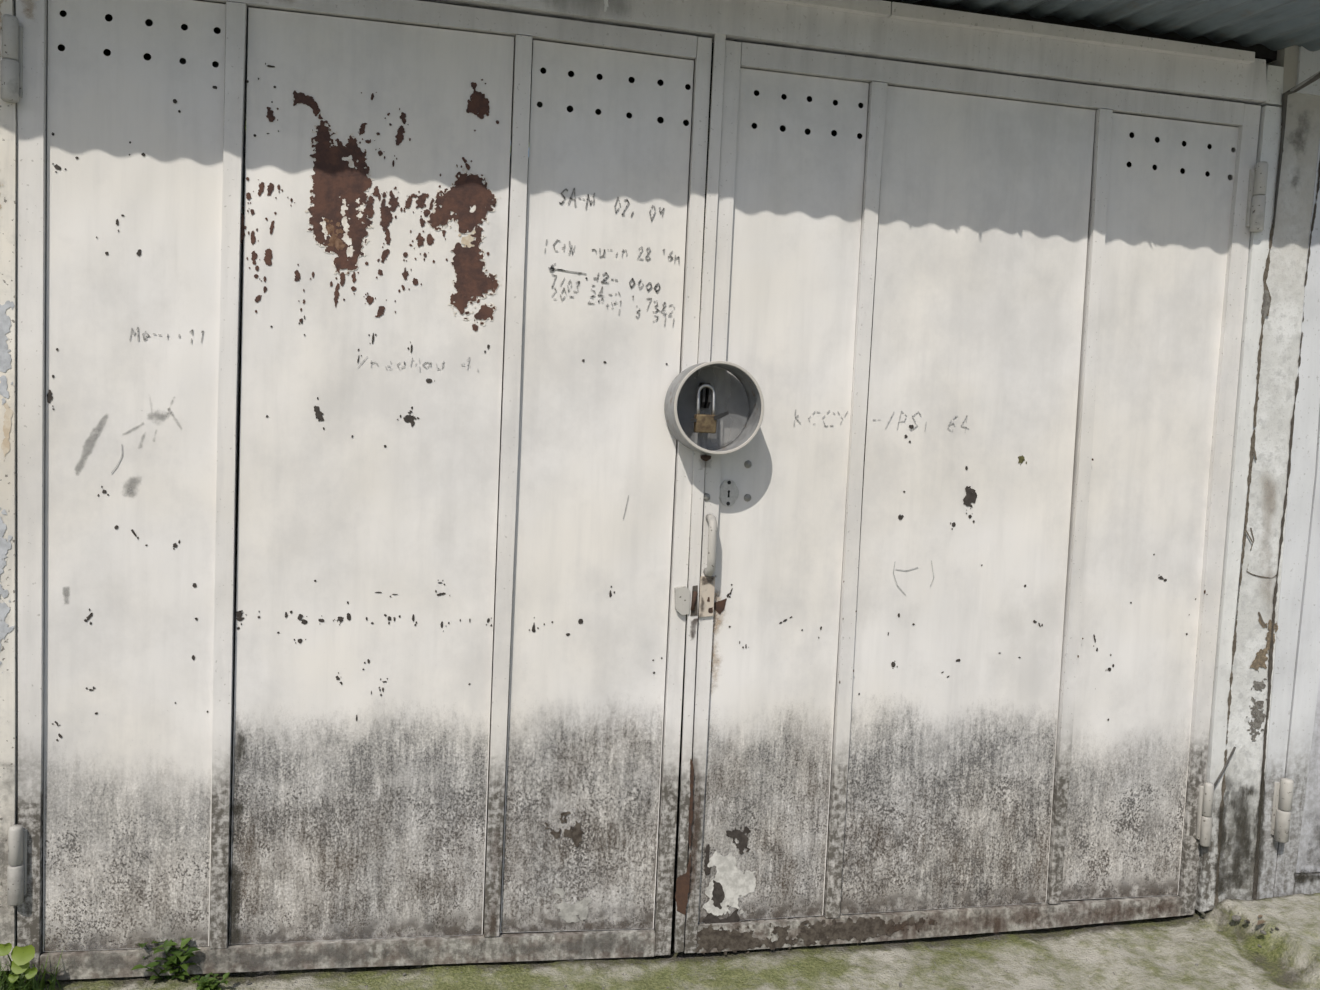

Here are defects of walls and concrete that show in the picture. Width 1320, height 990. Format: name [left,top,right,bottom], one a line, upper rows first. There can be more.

peeling [0,301,14,461]
peeling [0,507,15,673]
spalling [277,601,417,644]
corrosion [691,577,733,672]
spalling [1246,617,1278,742]
damp [44,784,211,952]
damp [228,724,487,944]
damp [501,725,662,932]
peeling [702,826,793,924]
damp [699,718,830,923]
damp [840,720,1187,914]